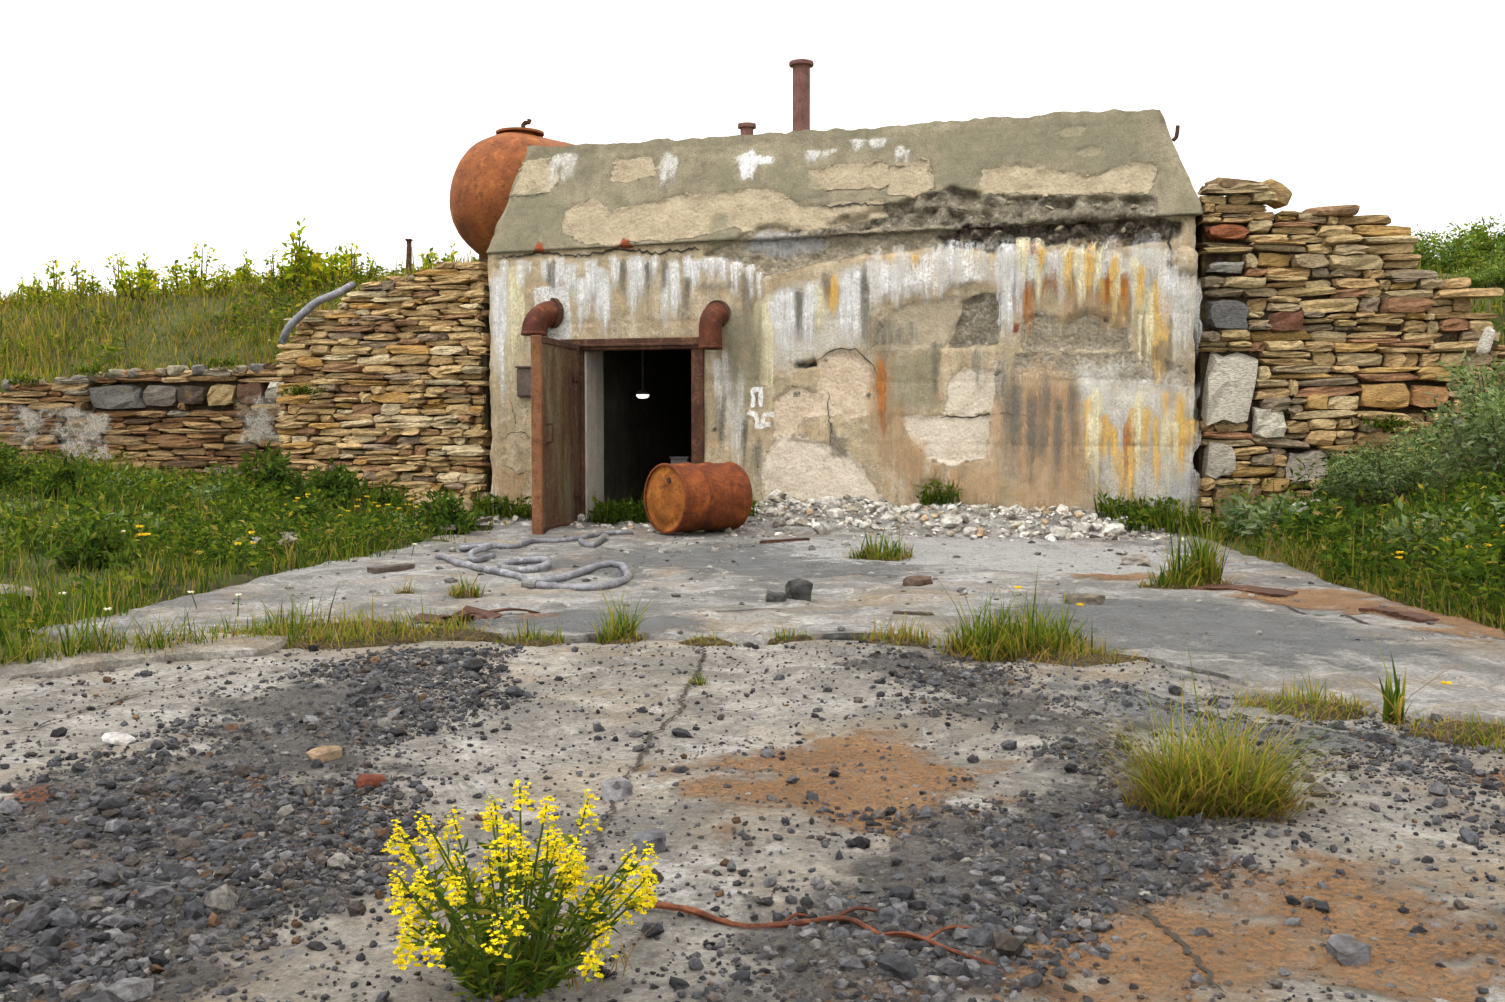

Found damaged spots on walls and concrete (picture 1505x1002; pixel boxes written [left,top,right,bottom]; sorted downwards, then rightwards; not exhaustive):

peeling [562,126,1182,277]
damp [489,196,1202,468]
peeling [761,292,1190,502]
damp [973,345,1201,512]
rust [1013,238,1195,497]
crack [582,647,777,862]